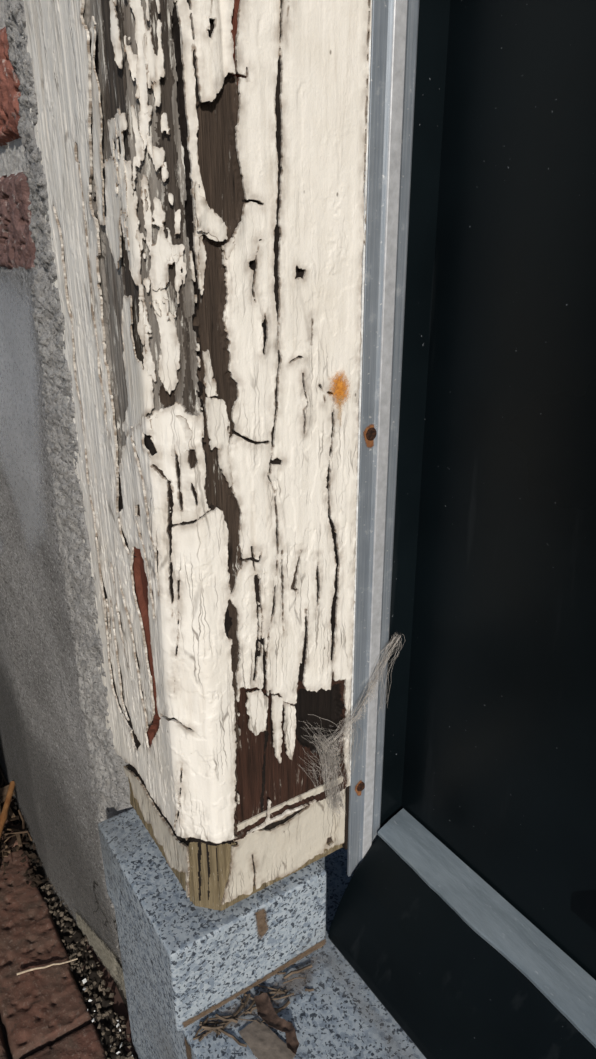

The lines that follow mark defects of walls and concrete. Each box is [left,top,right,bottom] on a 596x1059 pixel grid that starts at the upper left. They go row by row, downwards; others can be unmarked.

crack [101,571,192,730]
crack [118,0,214,655]
peeling [83,0,347,911]
crack [274,0,282,321]
crack [231,352,339,813]
rust [332,374,348,405]